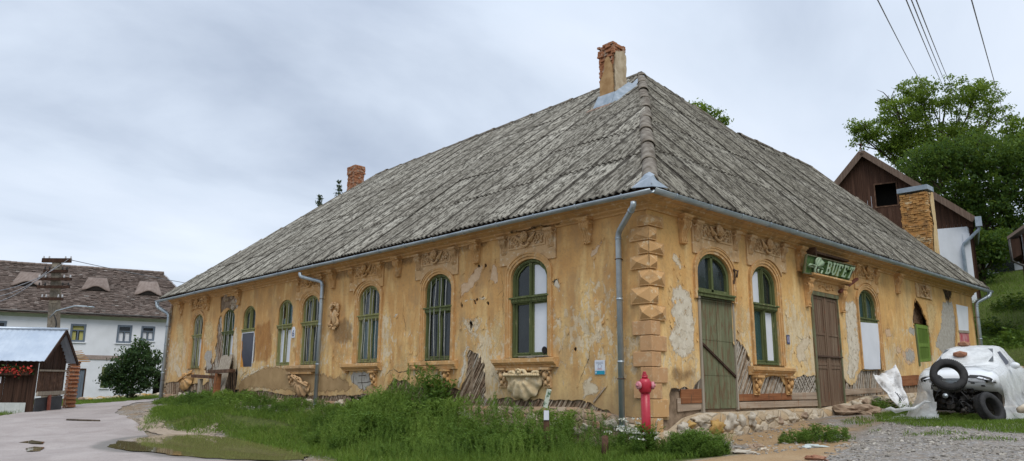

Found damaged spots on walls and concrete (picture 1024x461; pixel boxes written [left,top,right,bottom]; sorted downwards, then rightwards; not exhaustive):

flaking render [225,327,238,394]
peeling [458,259,501,372]
peeling [668,254,699,361]
peeling [845,298,861,385]
peeling [914,299,936,334]